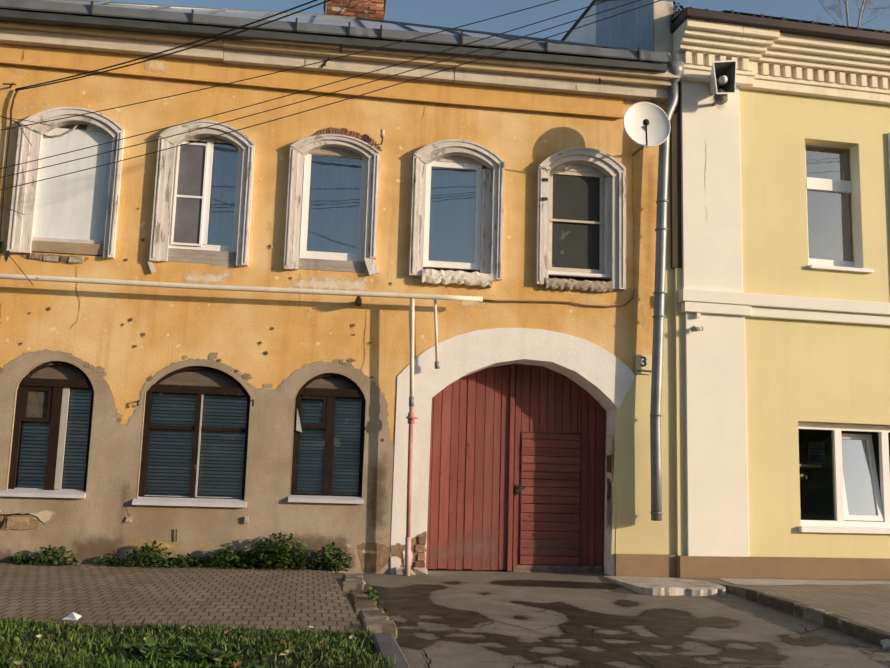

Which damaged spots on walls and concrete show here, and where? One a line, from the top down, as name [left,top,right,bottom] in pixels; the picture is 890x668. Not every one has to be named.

spalling [313,127,382,153]
spalling [0,509,54,531]
spalling [346,531,428,575]